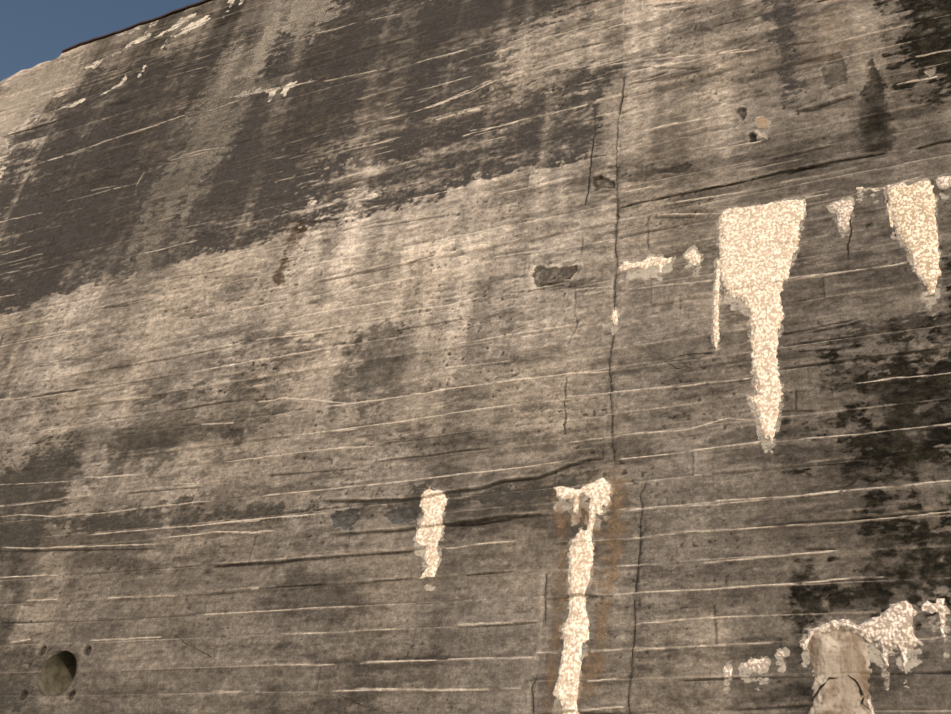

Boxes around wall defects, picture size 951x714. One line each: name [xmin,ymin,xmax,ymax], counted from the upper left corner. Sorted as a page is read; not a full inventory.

water stain [0,0,622,314]
spalling [532,266,578,287]
water stain [619,256,672,272]
water stain [608,163,691,182]
water stain [684,249,701,265]
crack [585,78,887,457]
water stain [713,199,806,455]
water stain [784,175,951,638]
crack [916,140,951,149]
water stain [0,434,613,714]
crack [628,484,646,713]
water stain [723,651,784,678]